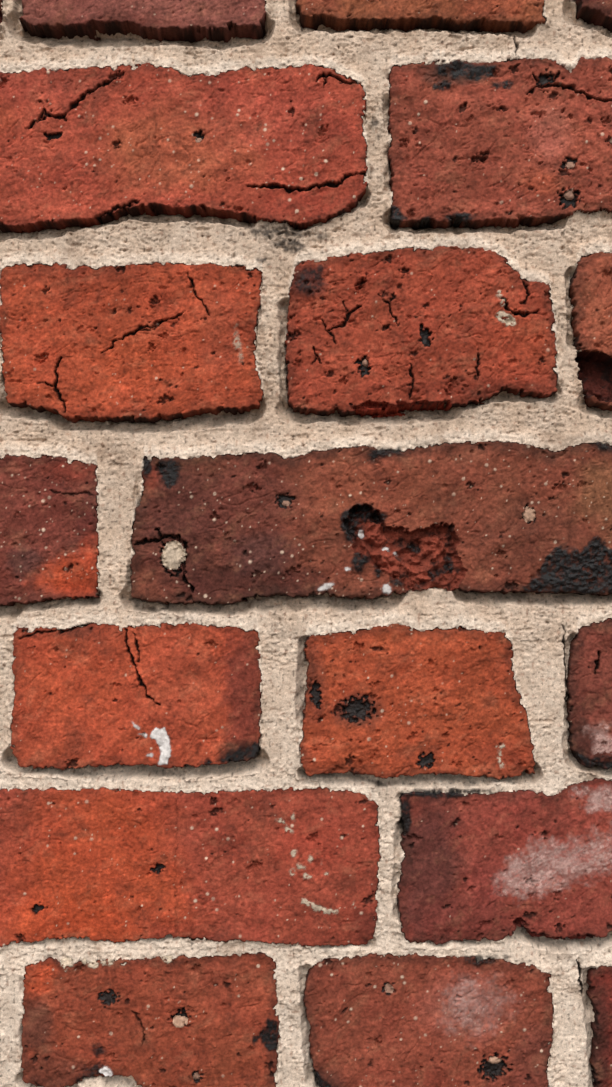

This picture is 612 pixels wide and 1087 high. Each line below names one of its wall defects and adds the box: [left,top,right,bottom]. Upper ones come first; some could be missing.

crack [30,78,117,129]
crack [248,173,365,194]
crack [102,278,210,353]
crack [45,357,66,413]
spalling [343,503,468,591]
crack [125,629,160,705]